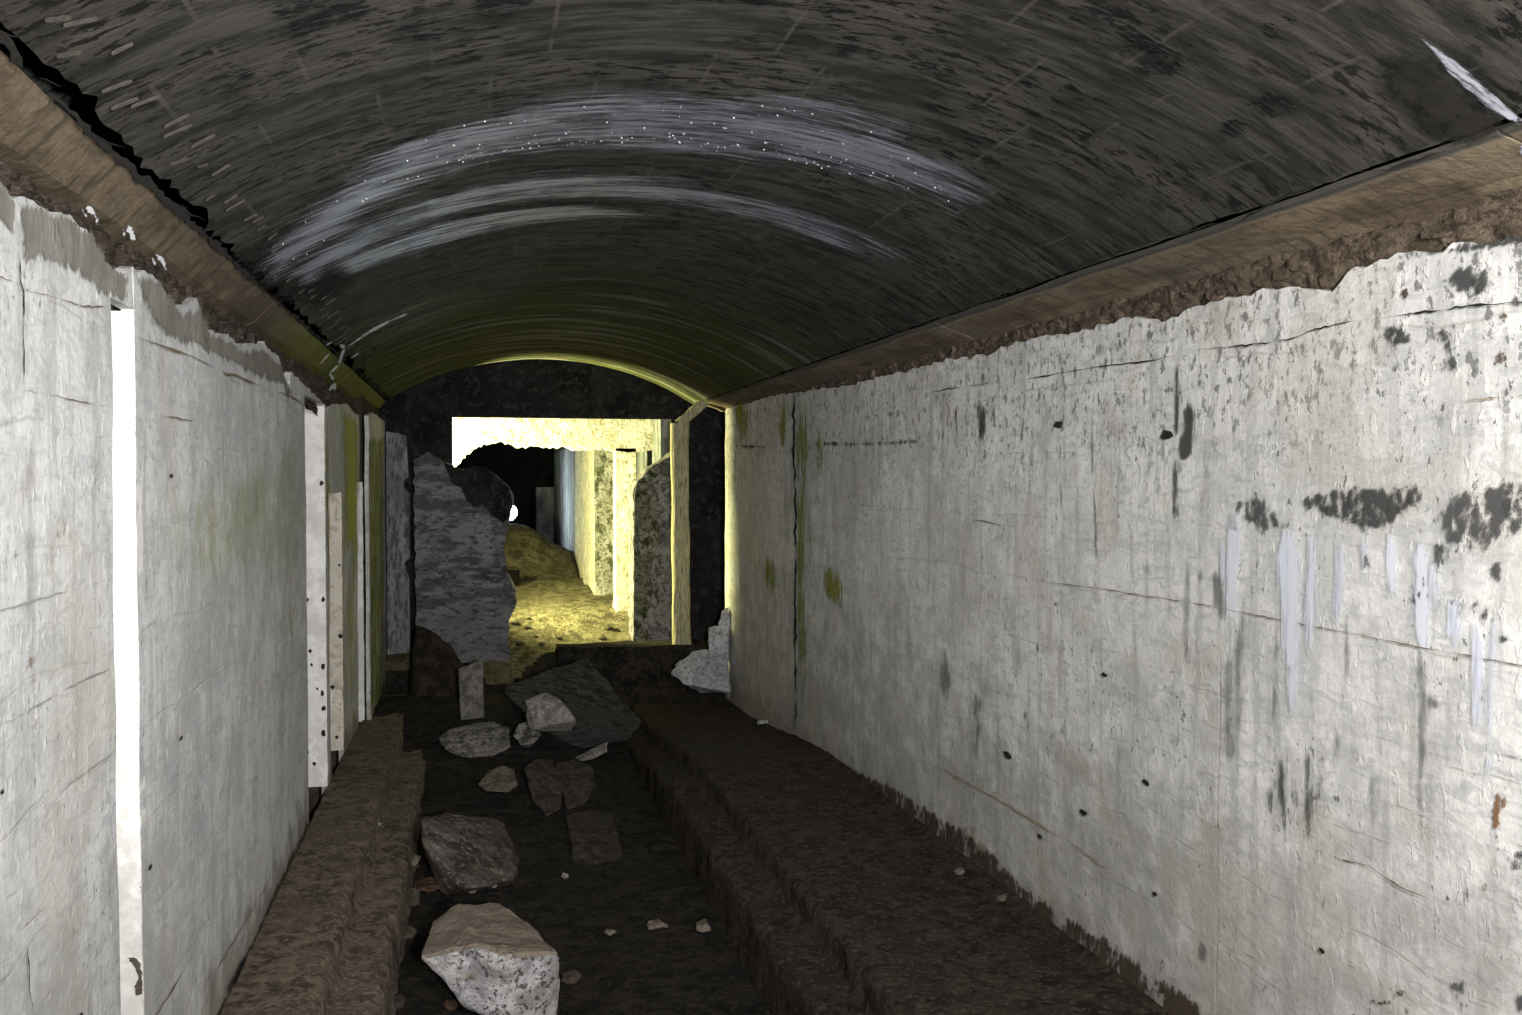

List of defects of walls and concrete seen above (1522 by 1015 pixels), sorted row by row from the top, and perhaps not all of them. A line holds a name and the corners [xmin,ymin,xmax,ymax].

flaking render [0,159,357,416]
flaking render [787,187,1522,394]
crack [731,120,1522,729]
crack [0,670,108,726]
leakage [1185,493,1343,739]
leakage [1304,478,1522,802]